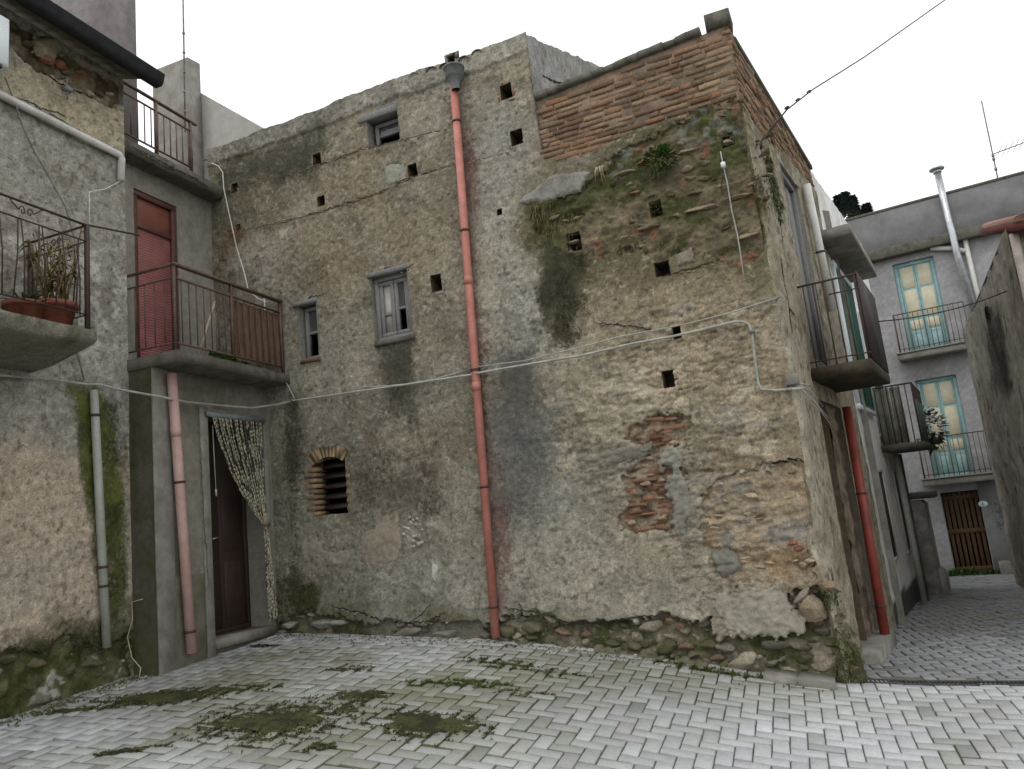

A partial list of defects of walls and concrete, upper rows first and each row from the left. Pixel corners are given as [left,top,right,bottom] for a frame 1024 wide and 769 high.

spalling [0,14,119,108]
crack [237,127,452,189]
crack [238,150,516,233]
leakage [526,234,588,346]
leakage [86,468,98,569]
flaking render [619,413,691,534]
crack [771,457,804,466]
crack [331,603,450,626]
spalling [277,462,867,685]
crack [505,603,662,625]